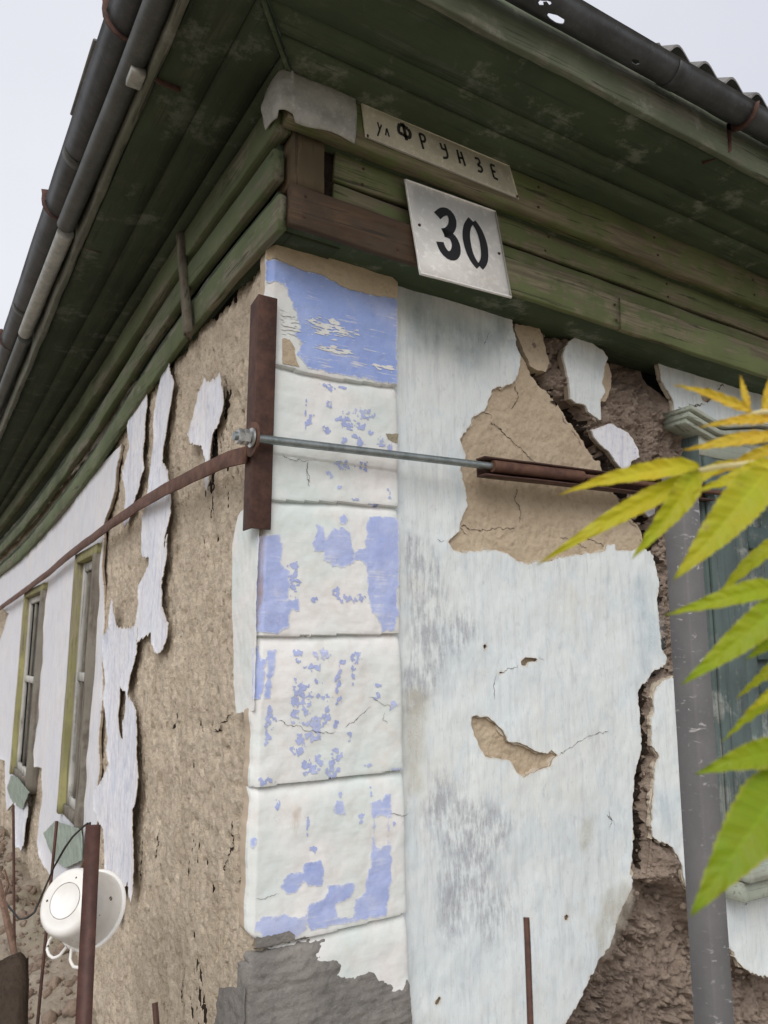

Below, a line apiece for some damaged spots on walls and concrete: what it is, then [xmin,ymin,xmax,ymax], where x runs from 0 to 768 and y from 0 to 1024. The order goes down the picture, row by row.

peeling [0,380,138,562]
spalling [449,324,655,563]
peeling [0,609,9,638]
peeling [93,245,412,1024]
crack [520,333,724,879]
spalling [471,716,555,775]
peeling [0,759,59,942]